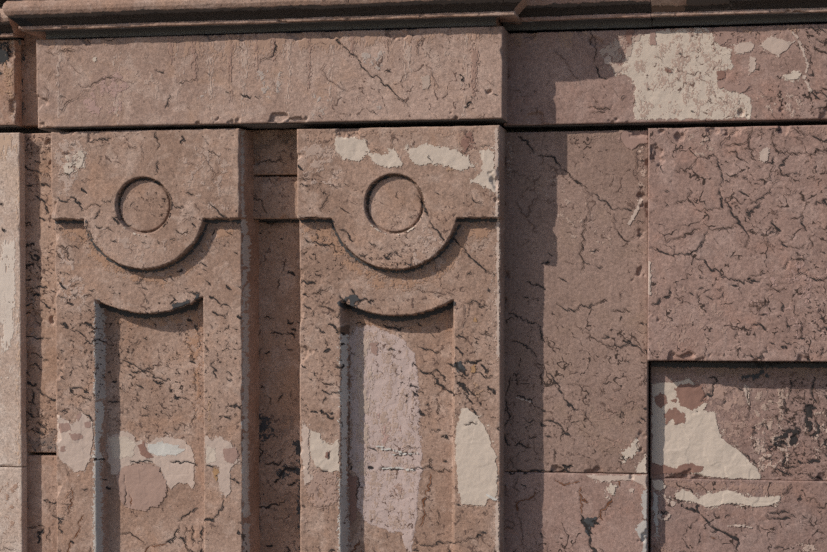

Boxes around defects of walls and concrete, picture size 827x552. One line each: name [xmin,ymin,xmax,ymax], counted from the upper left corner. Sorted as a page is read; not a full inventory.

crack [46,47,133,110]
peeling [716,70,749,94]
crack [25,133,244,451]
peeling [654,380,768,444]
peeling [56,407,195,490]
crack [29,490,84,552]